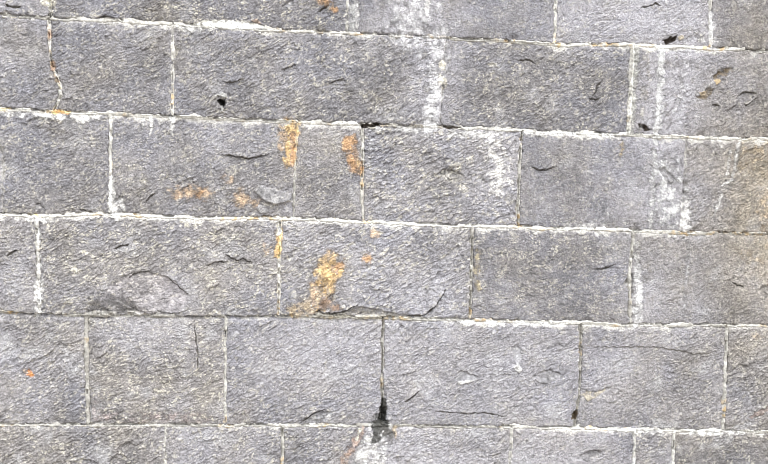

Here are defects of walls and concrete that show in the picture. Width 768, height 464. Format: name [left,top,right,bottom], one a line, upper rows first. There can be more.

rust [276,113,302,170]
rust [339,133,366,178]
spalling [86,272,188,315]
rust [285,248,347,321]